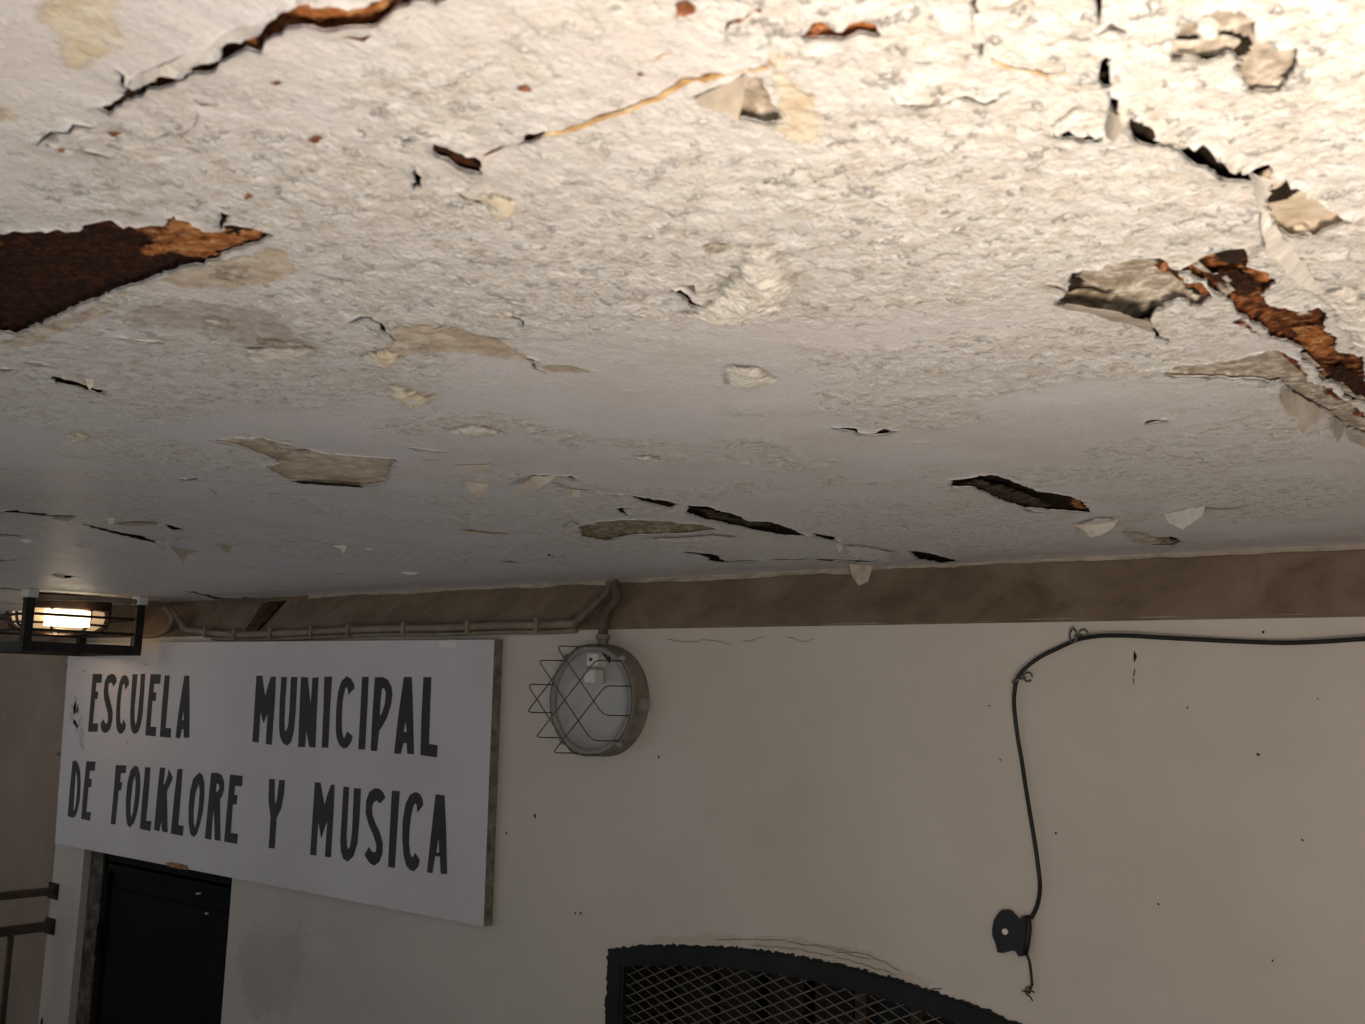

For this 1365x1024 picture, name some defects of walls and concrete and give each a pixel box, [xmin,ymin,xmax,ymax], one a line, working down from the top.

peeling [1171,11,1297,91]
peeling [693,56,827,146]
crack [971,0,1300,206]
rust [0,213,272,333]
peeling [0,248,317,364]
peeling [384,325,587,373]
peeling [1054,258,1235,339]
peeling [1250,167,1348,295]
peeling [1166,350,1365,448]
peeling [216,438,396,488]
peeling [564,519,755,562]
peeling [1164,505,1244,529]